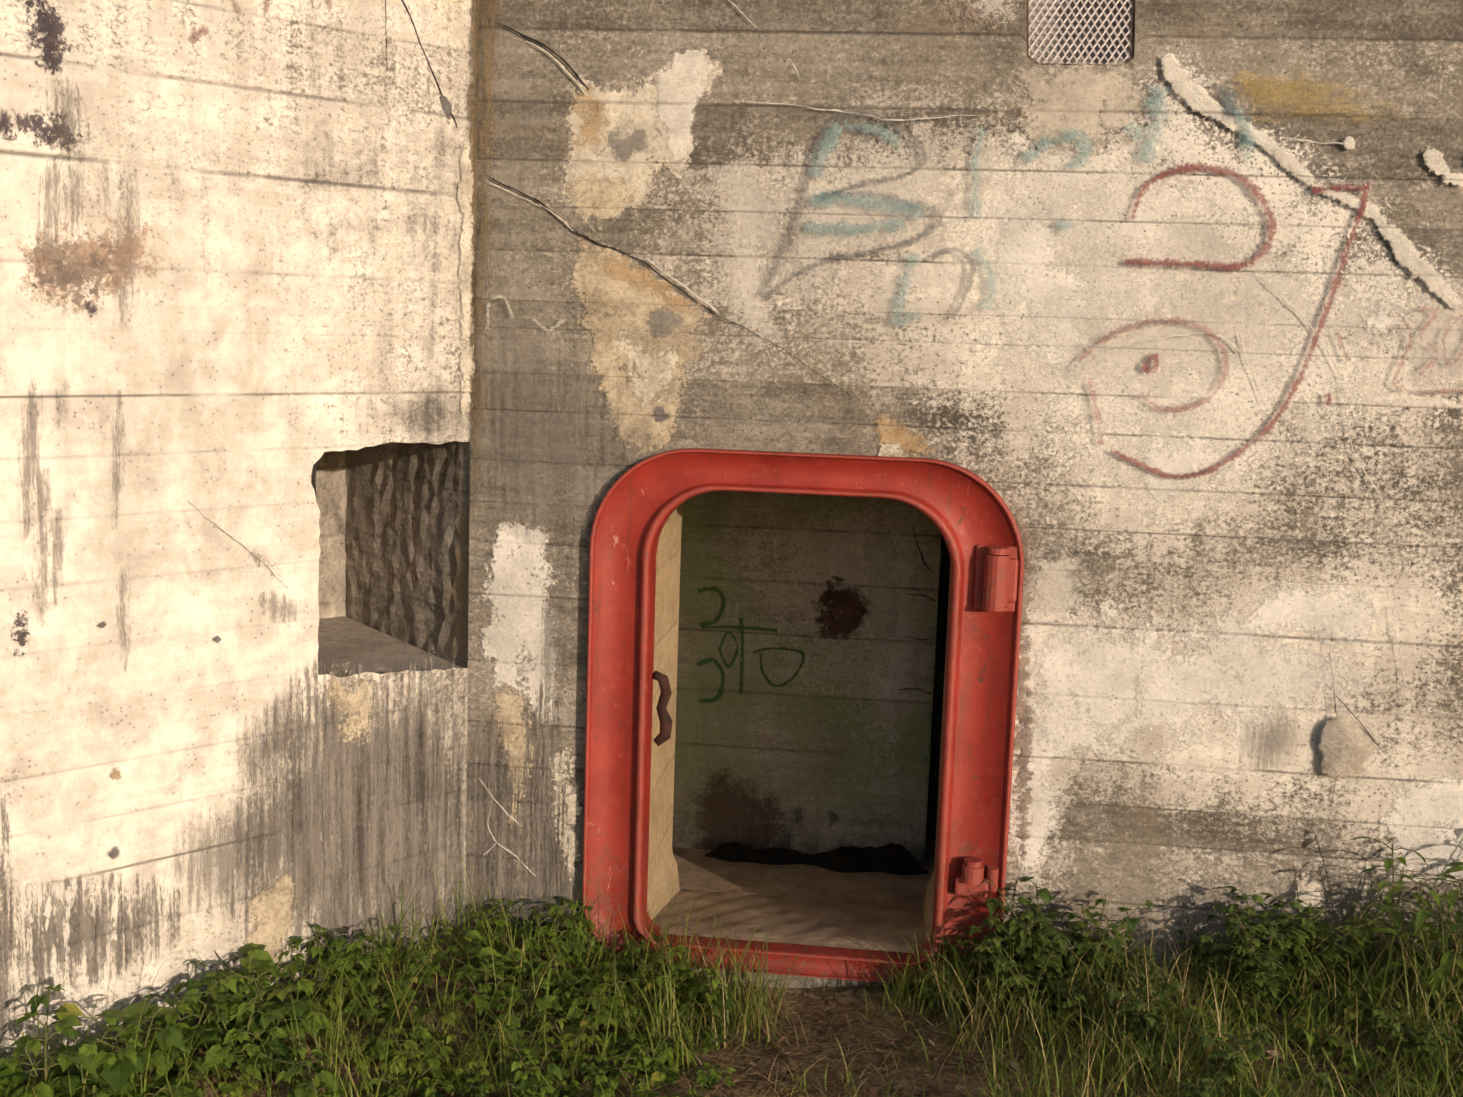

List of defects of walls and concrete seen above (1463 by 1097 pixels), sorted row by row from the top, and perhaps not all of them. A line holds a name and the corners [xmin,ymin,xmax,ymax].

damp [0,107,83,150]
damp [24,0,71,75]
crack [385,0,458,128]
crack [489,19,589,96]
spalling [561,46,723,454]
crack [481,172,853,398]
peeling [711,40,1463,526]
damp [1161,53,1463,309]
damp [0,800,183,1052]
damp [227,661,577,961]
peeling [481,522,582,883]
rust [811,576,875,640]